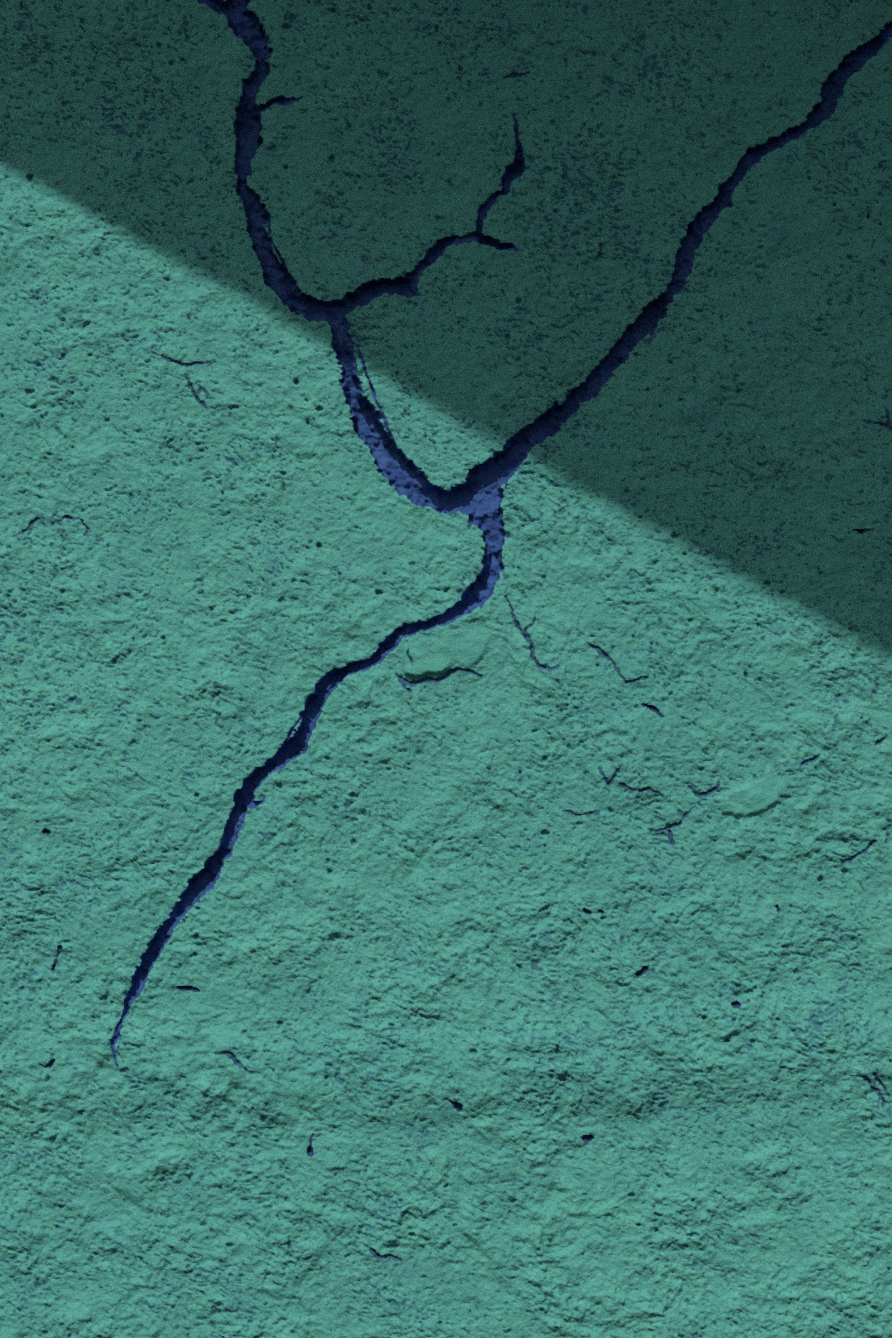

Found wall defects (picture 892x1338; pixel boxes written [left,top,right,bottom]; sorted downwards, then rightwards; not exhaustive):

crack [110,0,892,1074]